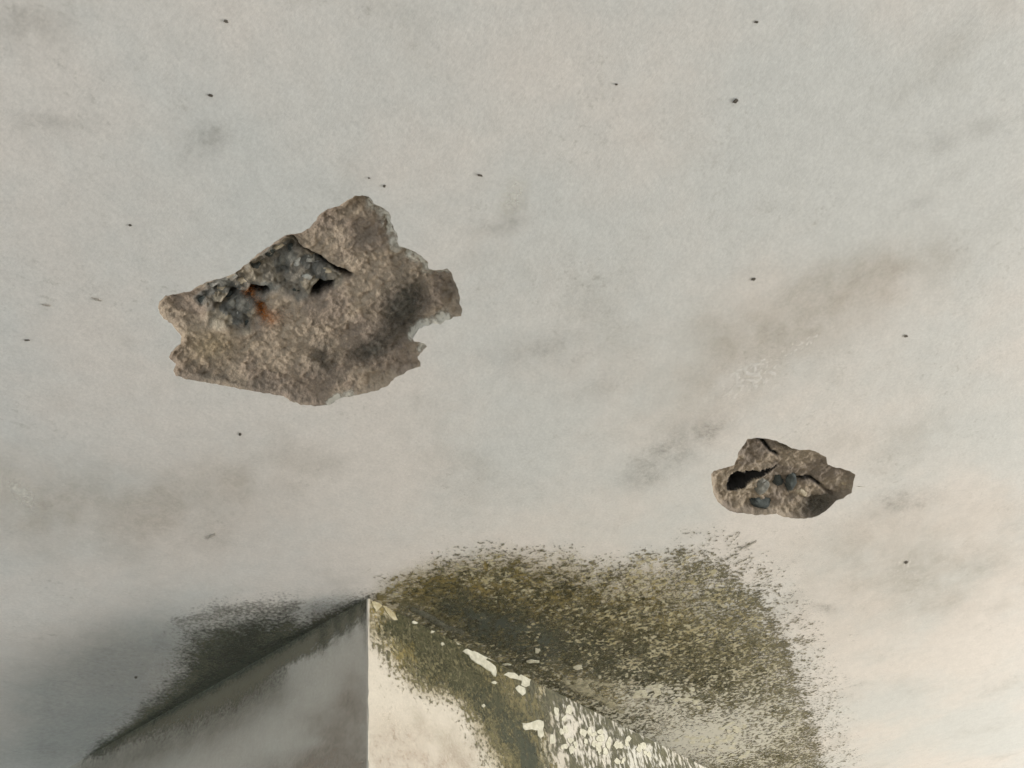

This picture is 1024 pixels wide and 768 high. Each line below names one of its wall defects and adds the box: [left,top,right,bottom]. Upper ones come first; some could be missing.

spalling [158,195,462,406]
spalling [711,438,862,519]
leakage [90,531,858,768]
peeling [431,631,531,696]
peeling [632,684,664,699]
peeling [672,687,701,709]
peeling [522,705,651,764]